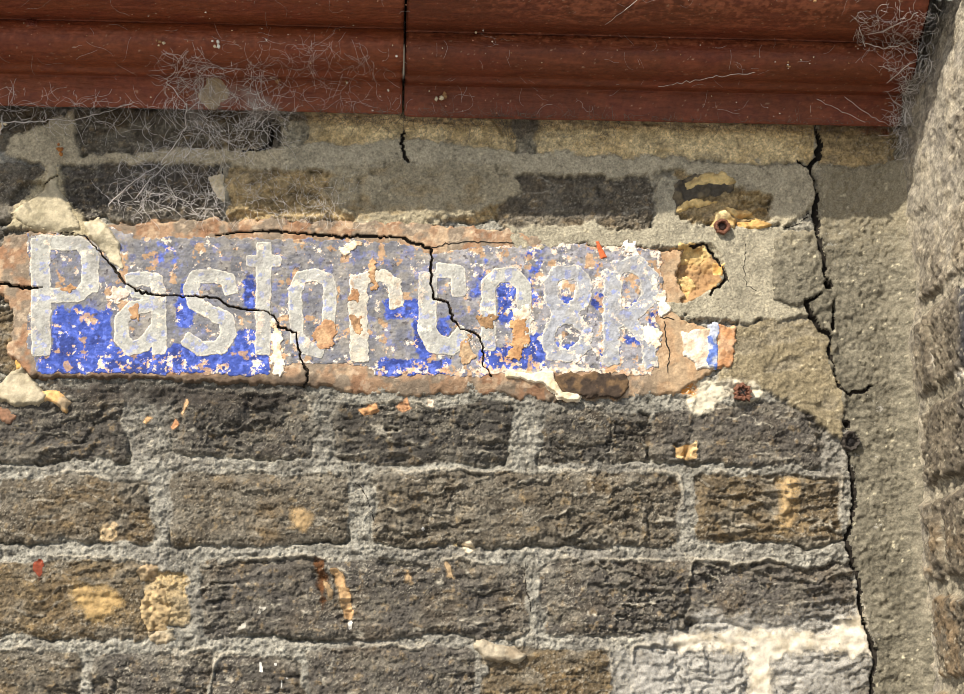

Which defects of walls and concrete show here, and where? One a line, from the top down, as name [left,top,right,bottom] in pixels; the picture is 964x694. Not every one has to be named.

crack [0,282,39,290]
crack [54,231,309,387]
peeling [269,318,285,377]
crack [215,230,513,377]
flaking render [476,304,629,402]
spalling [636,242,725,349]
peeling [706,321,737,370]
corrosion [680,378,766,415]
spalling [710,209,772,229]
crack [785,125,871,397]
spalling [136,564,176,645]
crack [843,450,878,694]